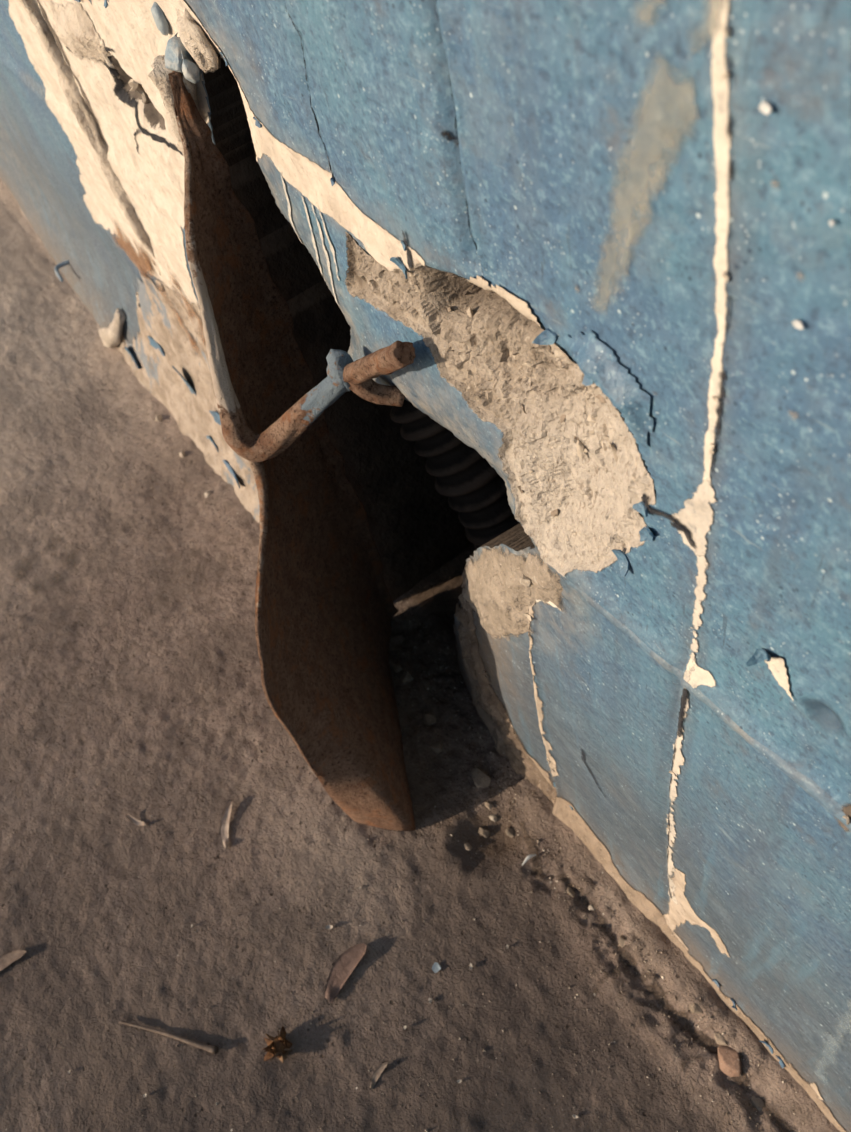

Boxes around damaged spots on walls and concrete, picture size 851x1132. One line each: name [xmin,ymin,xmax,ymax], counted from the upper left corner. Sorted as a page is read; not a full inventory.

corrosion [115,227,164,297]
corrosion [173,280,206,352]
flaking render [8,0,656,577]
corrosion [249,461,269,608]
peeling [455,0,851,1132]
crack [641,494,695,548]
crack [677,689,688,737]